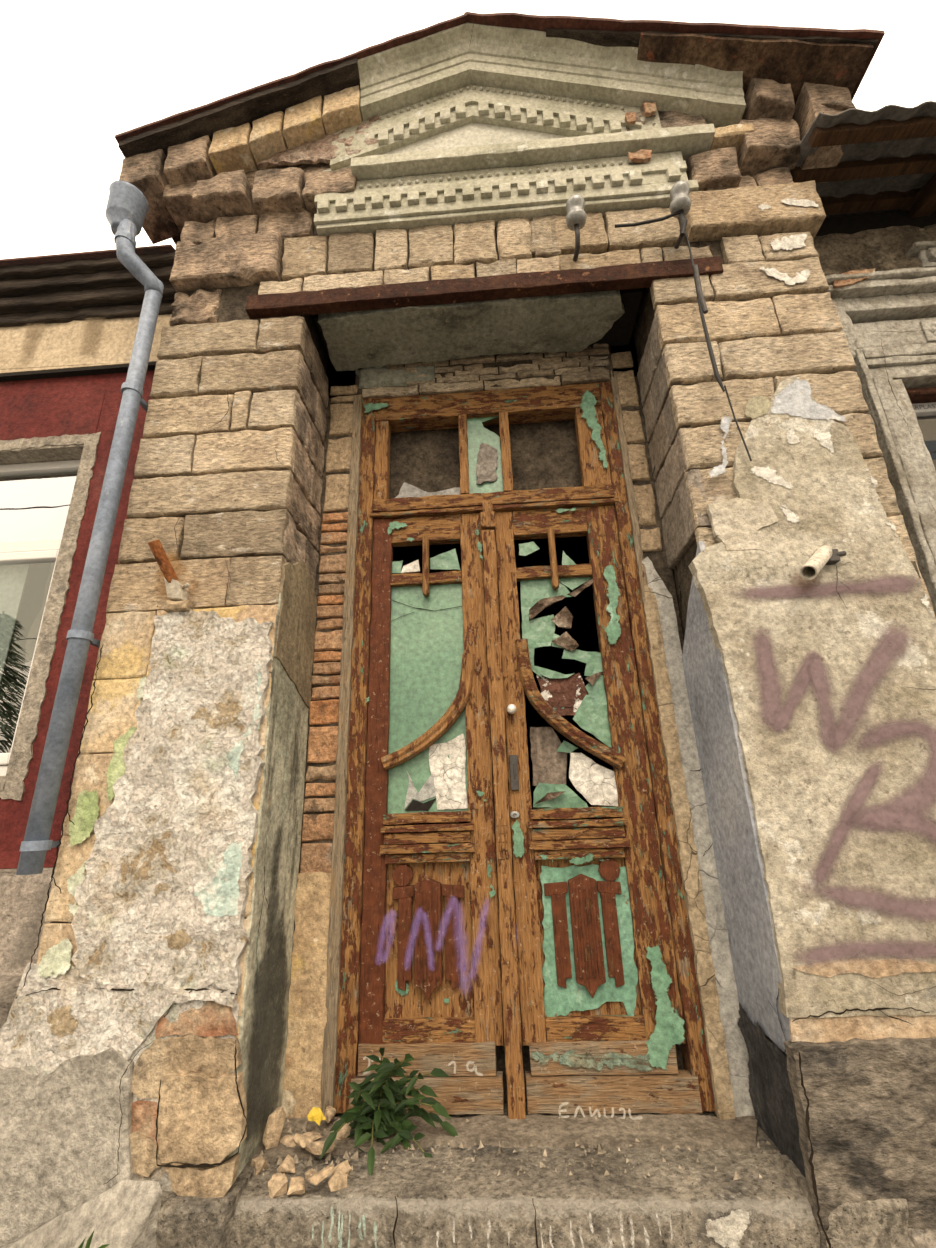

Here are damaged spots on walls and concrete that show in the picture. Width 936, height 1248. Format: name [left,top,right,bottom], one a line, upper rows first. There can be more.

peeling [0,609,274,1198]
peeling [688,377,936,1043]
crack [391,1196,399,1246]
crack [531,1198,539,1248]